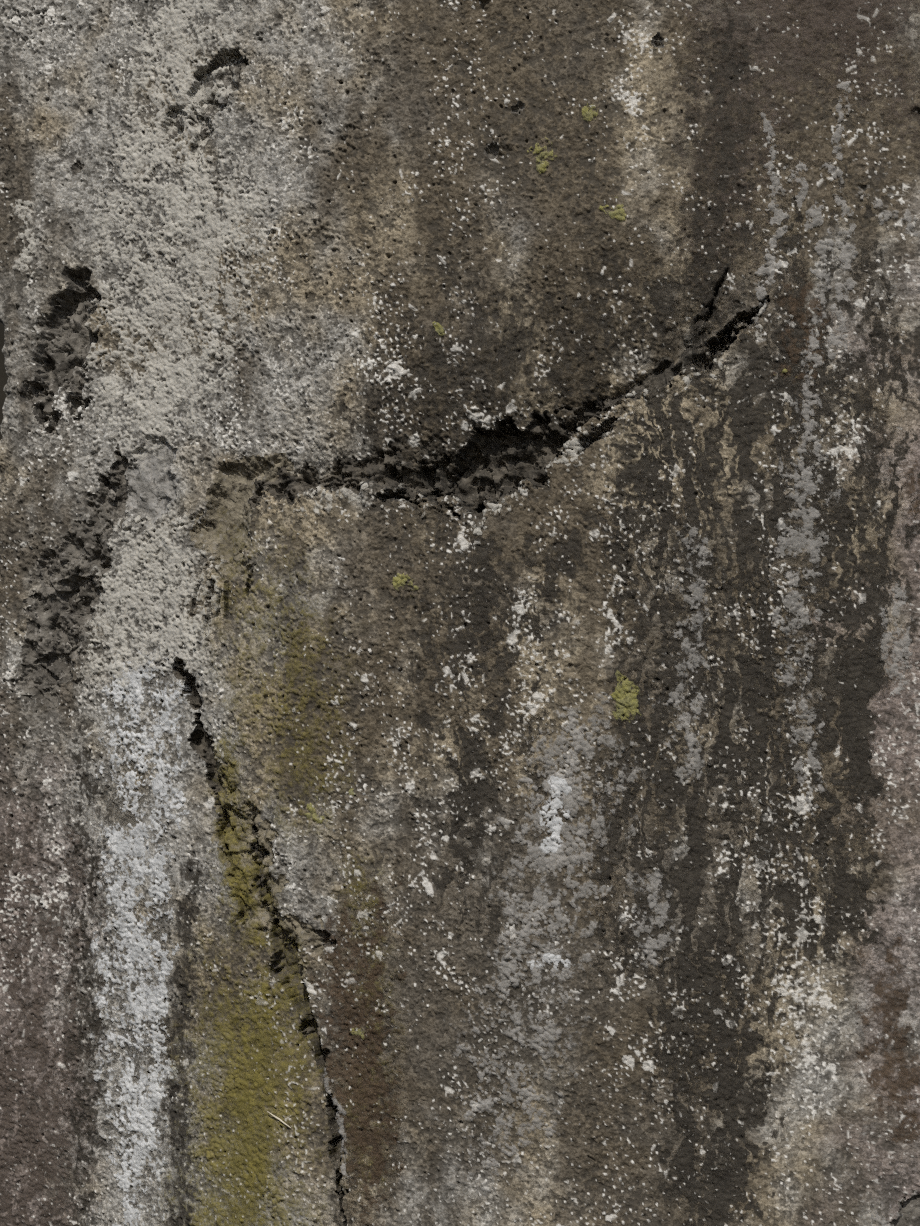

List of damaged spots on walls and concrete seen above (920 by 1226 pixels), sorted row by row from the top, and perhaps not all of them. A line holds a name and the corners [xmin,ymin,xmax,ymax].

spalling [16,266,103,435]
crack [248,266,770,535]
leakage [218,739,267,922]
crack [172,660,351,1226]